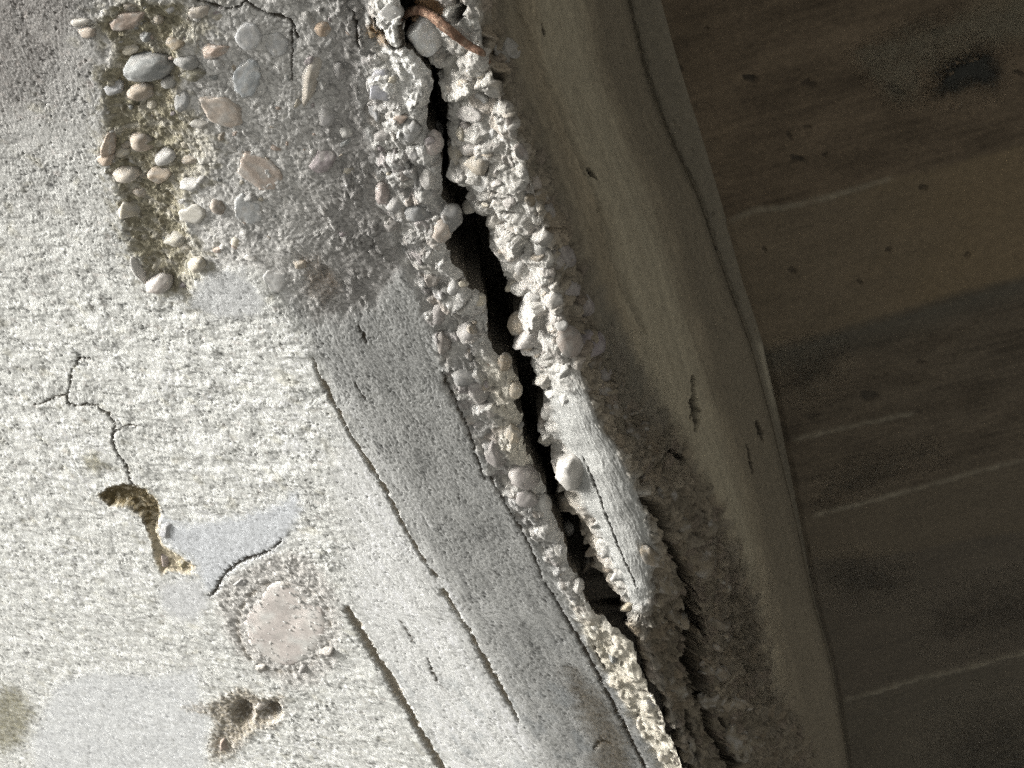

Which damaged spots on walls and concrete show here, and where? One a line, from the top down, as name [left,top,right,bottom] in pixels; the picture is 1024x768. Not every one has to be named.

rust [411,0,444,22]
crack [33,356,141,486]
crack [209,538,283,598]
crack [311,357,520,723]
spalling [70,0,818,768]
crack [352,0,743,768]